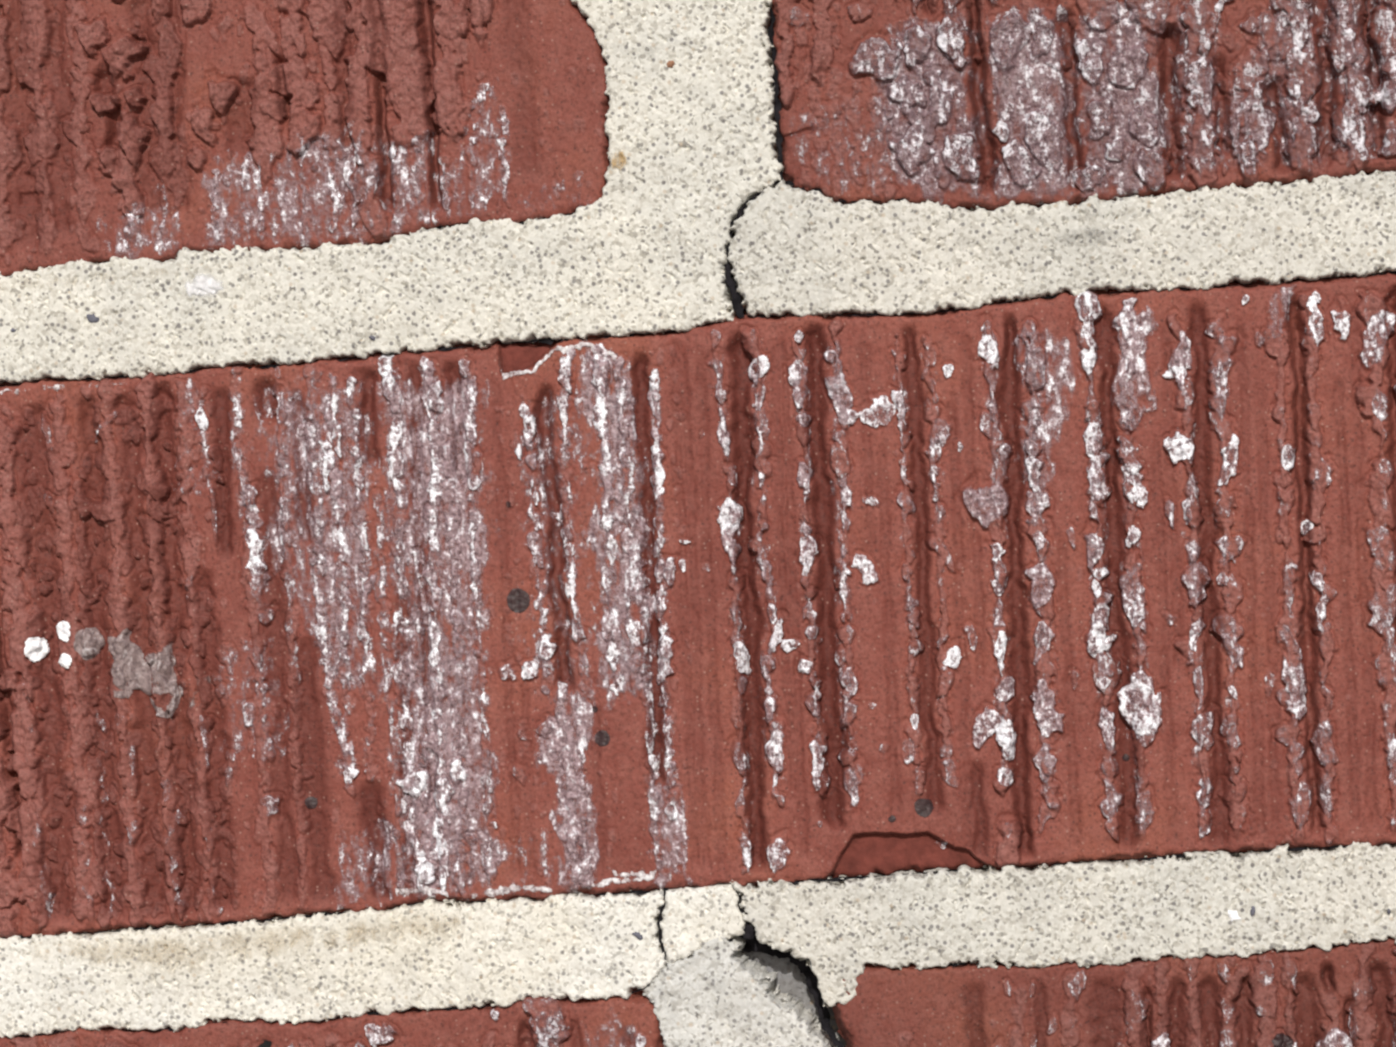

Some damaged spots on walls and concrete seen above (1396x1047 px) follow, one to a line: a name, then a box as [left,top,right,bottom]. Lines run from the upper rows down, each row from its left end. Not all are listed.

crack [0,376,129,387]
damp [202,83,510,246]
damp [227,339,691,900]
crack [244,4,1140,369]
damp [713,362,743,574]
damp [730,523,821,804]
damp [963,290,1243,838]
damp [849,0,1396,204]
crack [1179,271,1396,290]
damp [1259,287,1396,367]
crack [727,854,1186,1047]
crack [1229,843,1396,854]